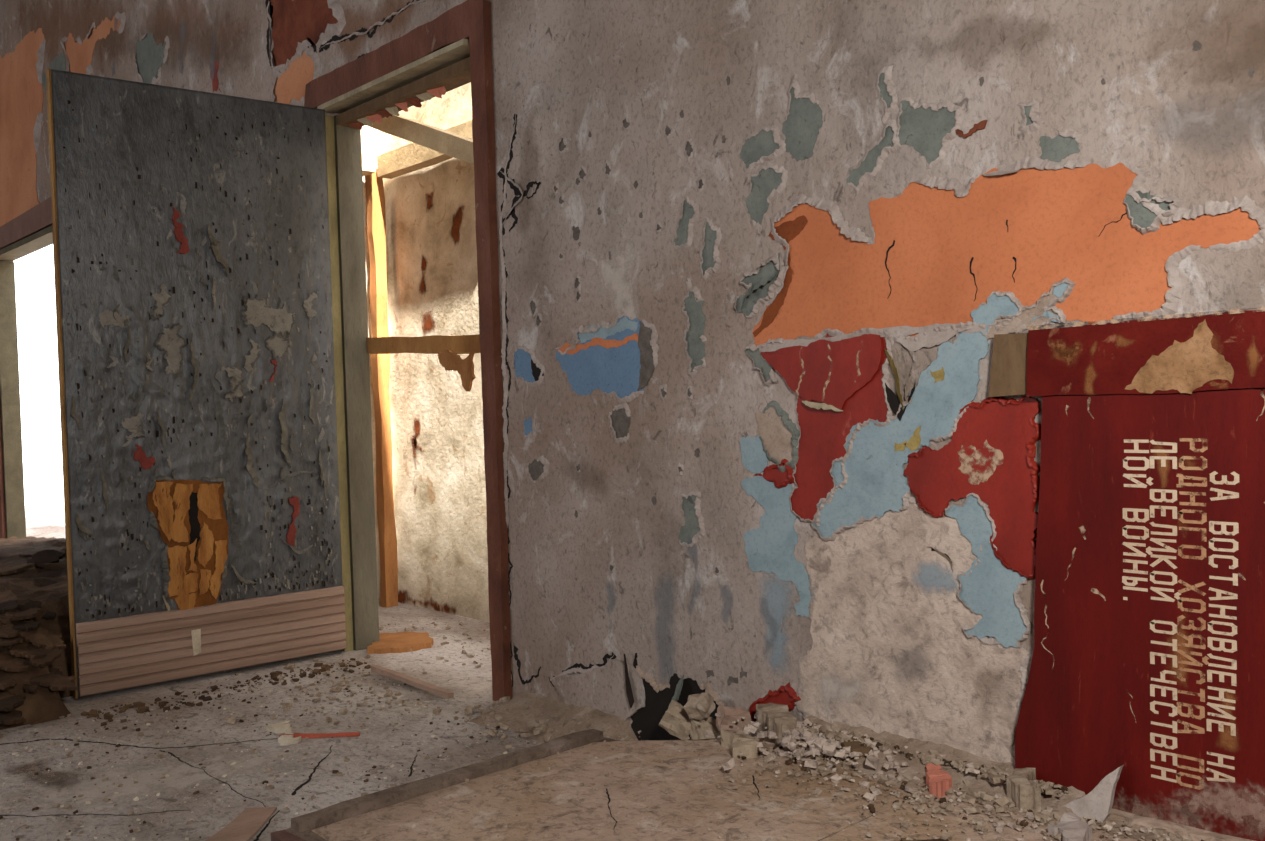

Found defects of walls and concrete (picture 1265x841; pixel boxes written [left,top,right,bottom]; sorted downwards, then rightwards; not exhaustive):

spalling [266,0,346,104]
crack [497,114,541,607]
spalling [512,313,668,444]
peeling [636,65,1265,764]
crack [510,642,617,687]